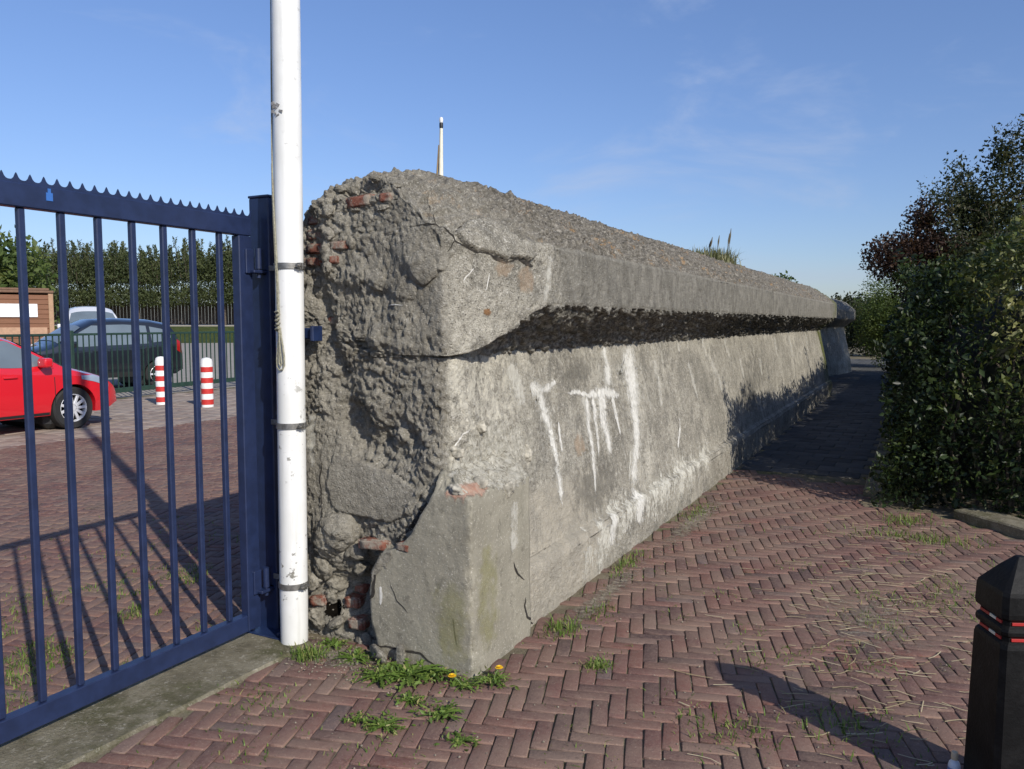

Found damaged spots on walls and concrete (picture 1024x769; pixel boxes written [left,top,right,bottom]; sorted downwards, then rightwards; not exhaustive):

spalling [304,174,402,289]
crack [409,194,533,267]
spalling [319,309,341,330]
spalling [307,452,421,665]